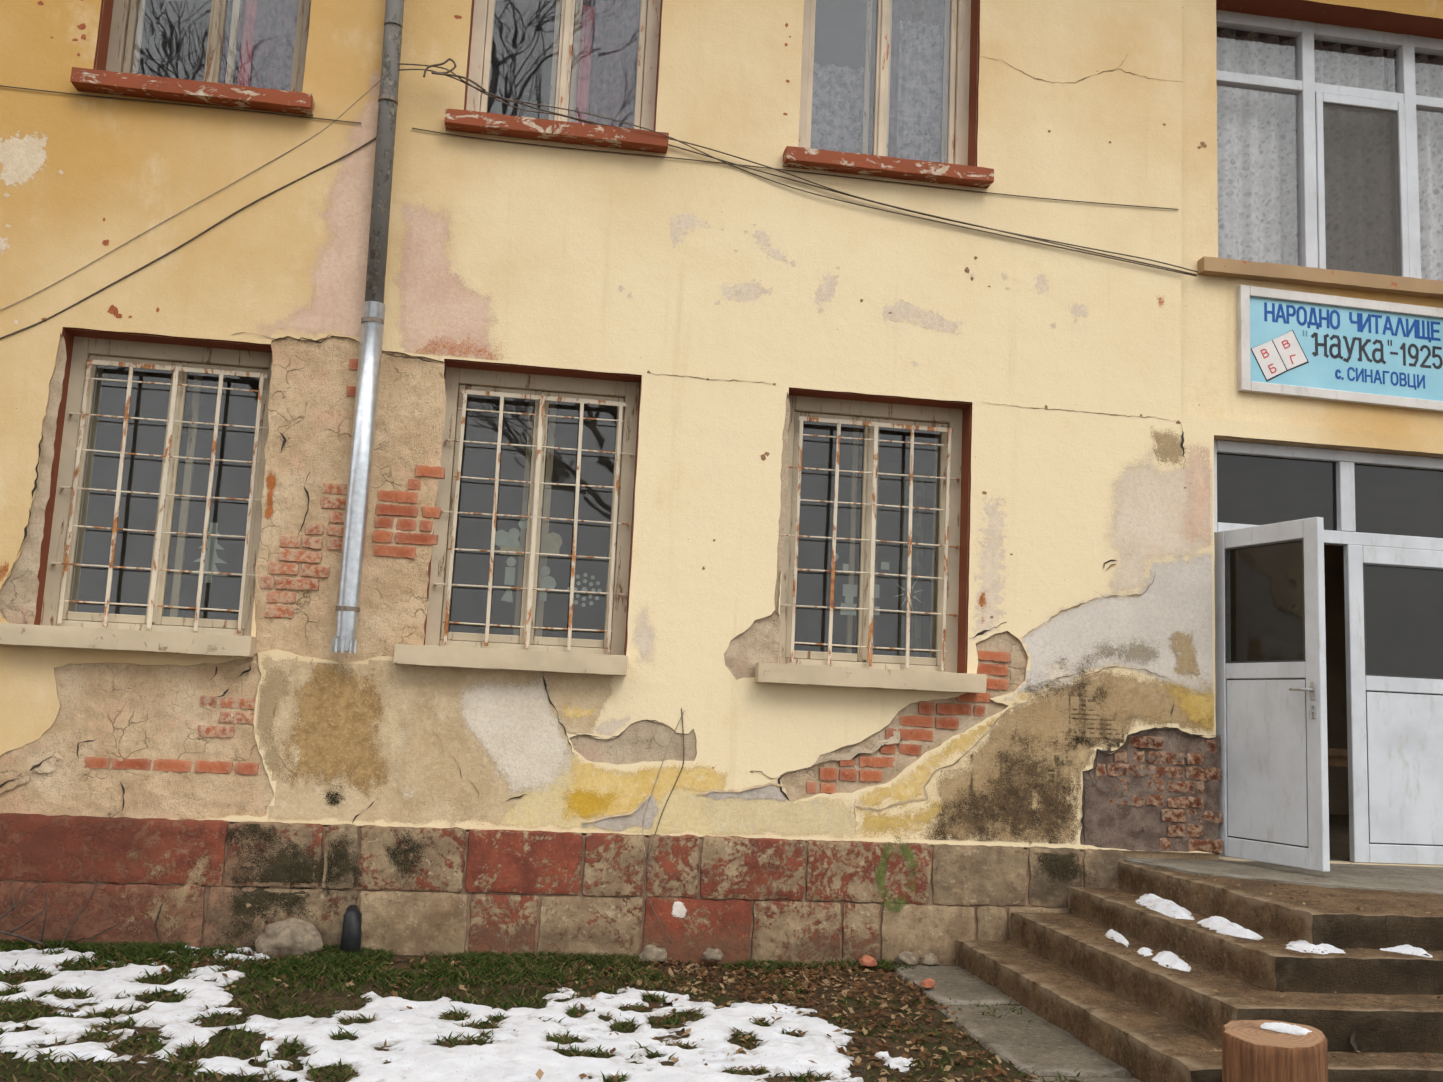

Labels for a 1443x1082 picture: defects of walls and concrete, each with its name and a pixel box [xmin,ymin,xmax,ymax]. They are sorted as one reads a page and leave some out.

spalling [0,26,446,942]
spalling [724,383,790,680]
spalling [498,491,1077,840]
damp [901,628,1213,900]
spalling [1062,673,1223,854]